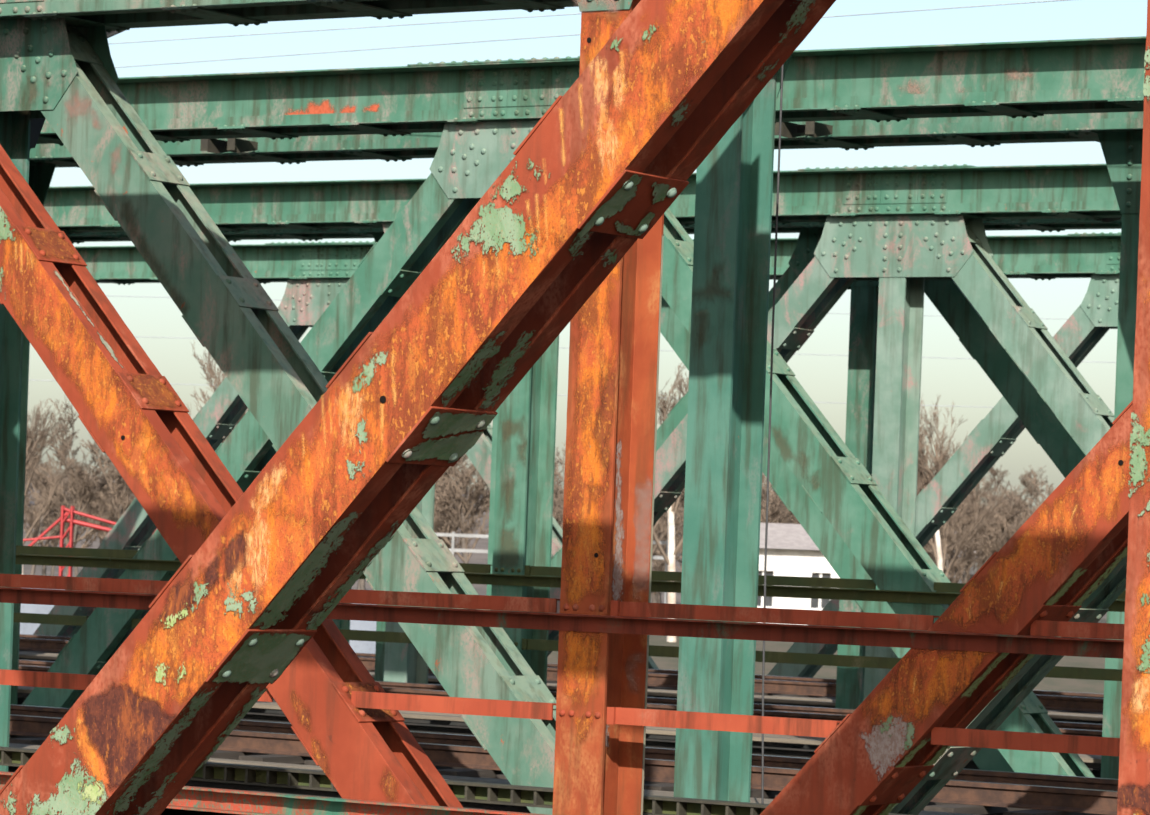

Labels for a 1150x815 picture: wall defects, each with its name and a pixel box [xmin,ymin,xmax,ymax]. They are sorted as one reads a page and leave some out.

peeling [0,206,16,243]
peeling [451,158,550,266]
rust [0,0,763,789]
peeling [1128,412,1150,498]
rust [940,442,1131,625]
peeling [1046,546,1128,606]
peeling [0,511,407,815]
peeling [958,653,1035,700]
rust [1128,558,1150,749]
peeling [1136,593,1150,674]
peeling [859,715,951,781]
rust [1117,784,1150,815]